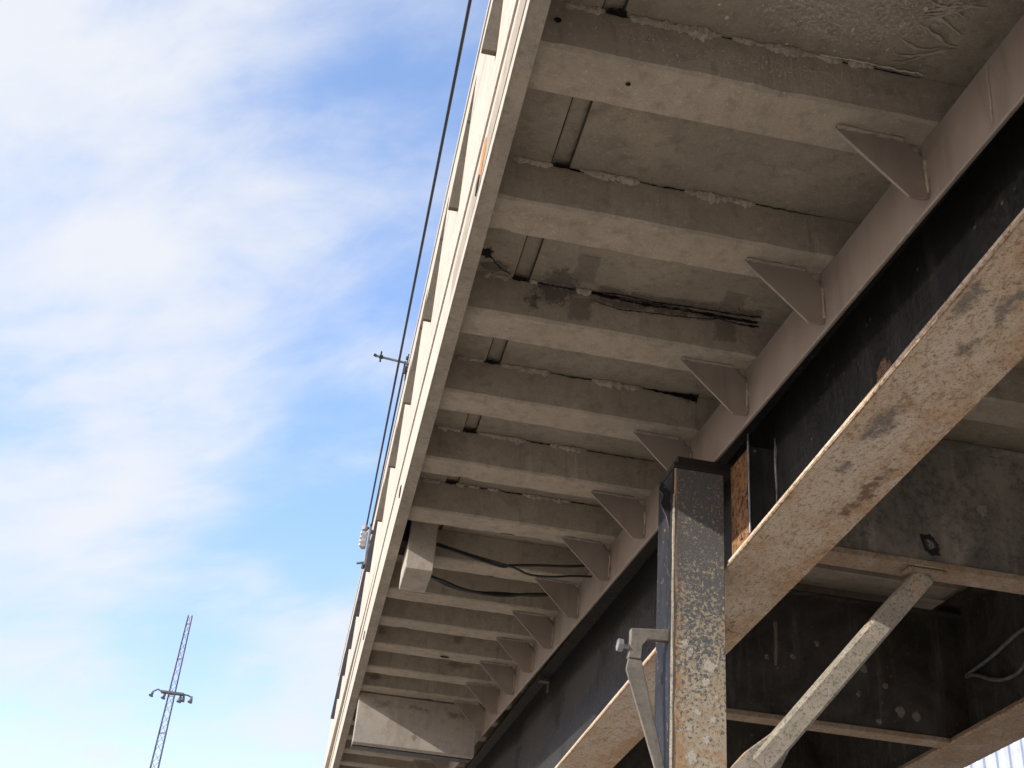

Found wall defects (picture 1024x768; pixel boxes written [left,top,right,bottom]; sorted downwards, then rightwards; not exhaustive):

crack [755,204,820,217]
crack [481,249,510,274]
crack [538,282,761,328]
crack [642,388,699,404]
rust [839,469,893,515]